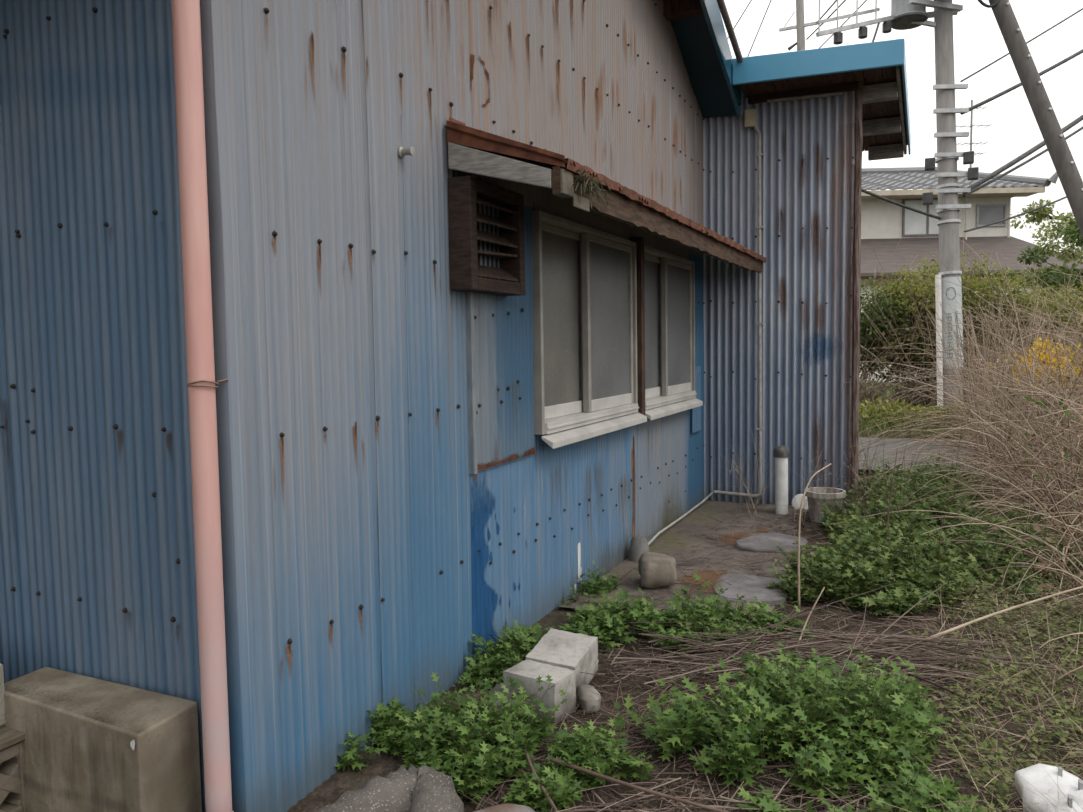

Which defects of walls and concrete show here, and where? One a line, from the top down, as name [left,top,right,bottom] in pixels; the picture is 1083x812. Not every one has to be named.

corrosion [555,0,584,25]
corrosion [582,77,614,116]
corrosion [813,214,821,252]
corrosion [474,447,535,480]